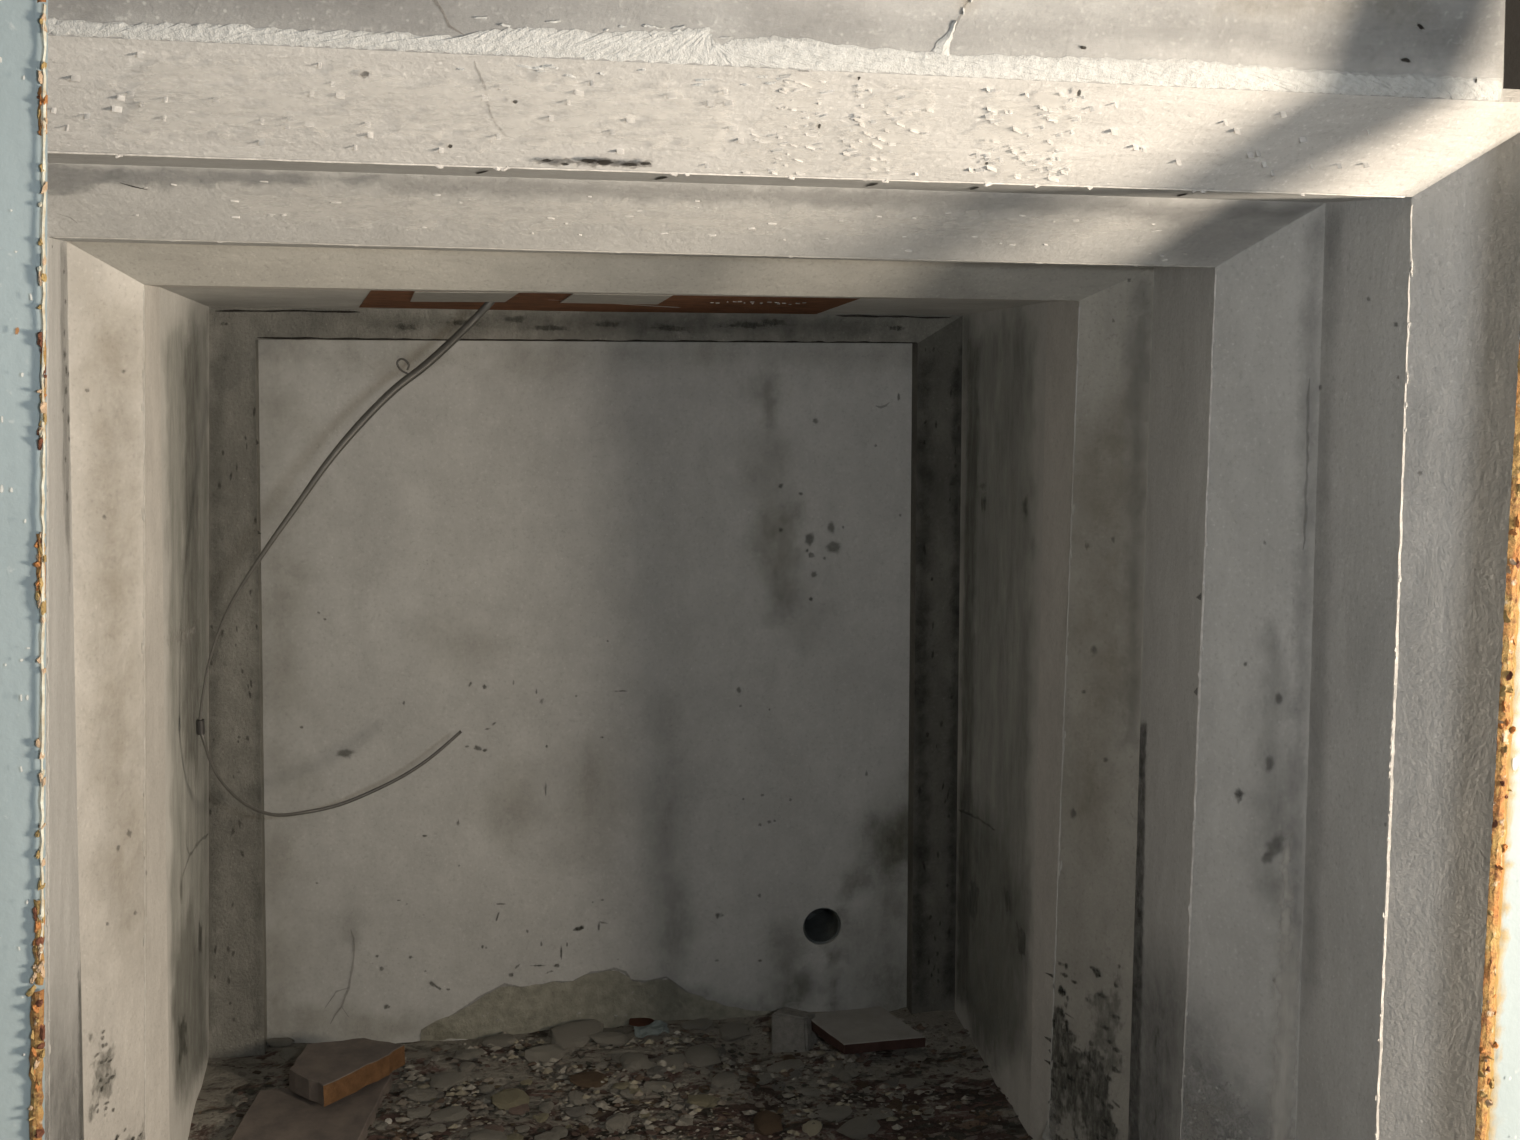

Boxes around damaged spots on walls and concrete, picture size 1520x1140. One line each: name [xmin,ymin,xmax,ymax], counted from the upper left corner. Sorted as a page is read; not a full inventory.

crack [933,0,973,56]
corrosion [37,86,48,136]
corrosion [36,332,47,450]
corrosion [33,532,46,601]
corrosion [1474,342,1520,1140]
water stain [1045,729,1252,1140]
corrosion [26,899,45,1140]
water stain [46,1031,115,1140]